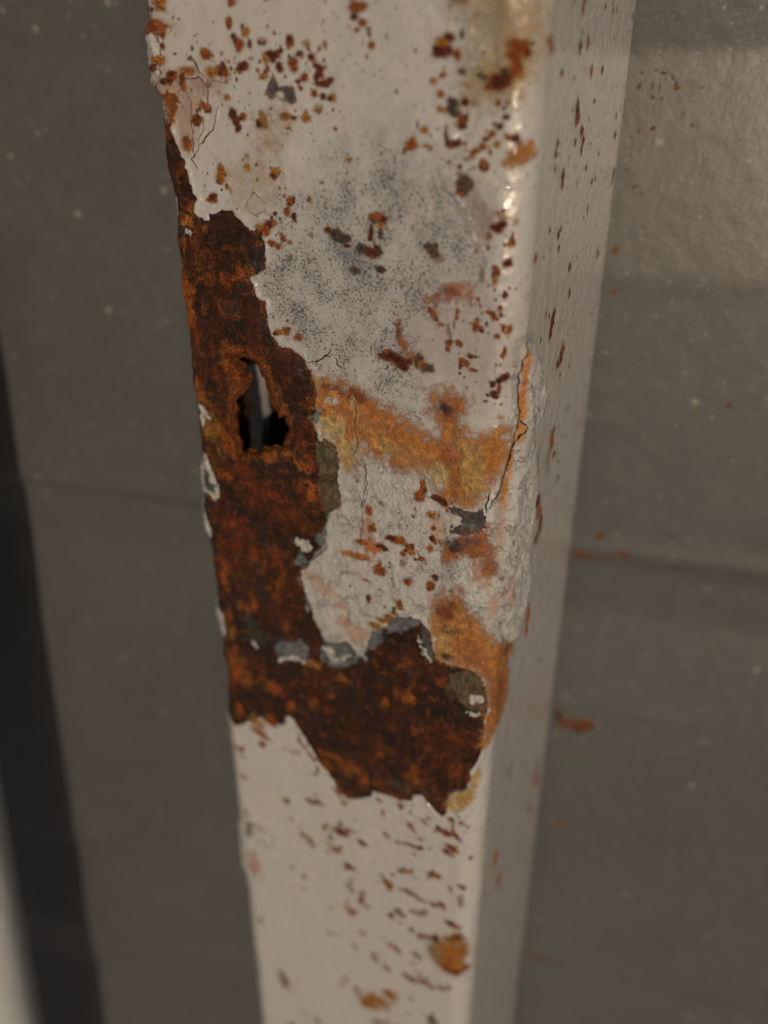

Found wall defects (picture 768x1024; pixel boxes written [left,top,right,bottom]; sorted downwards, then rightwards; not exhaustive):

crack [184,53,225,170]
rust [554,99,600,189]
peeling [258,144,485,418]
rust [541,309,574,377]
rust [145,0,545,1024]
spalling [431,495,487,536]
crack [485,341,529,514]
rust [530,425,627,560]